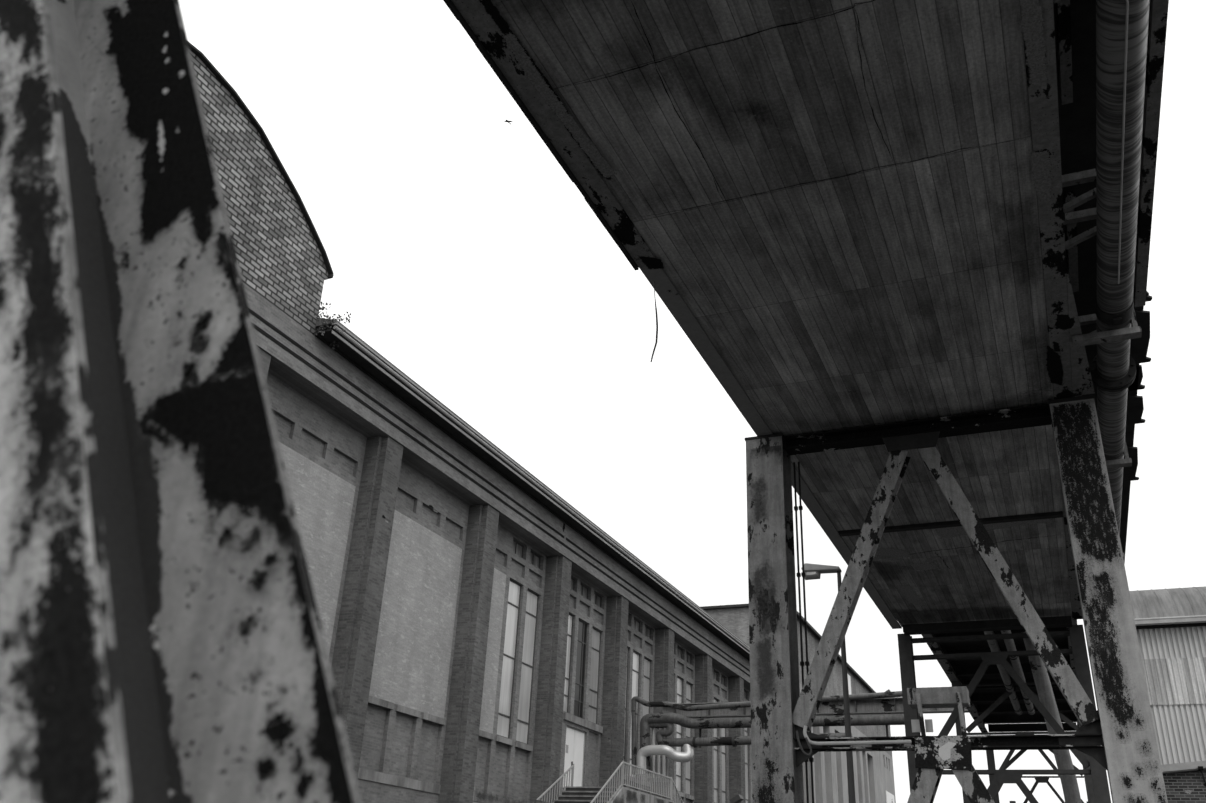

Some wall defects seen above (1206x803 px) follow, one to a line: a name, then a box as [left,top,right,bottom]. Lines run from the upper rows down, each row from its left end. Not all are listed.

peeling [59,88,193,803]